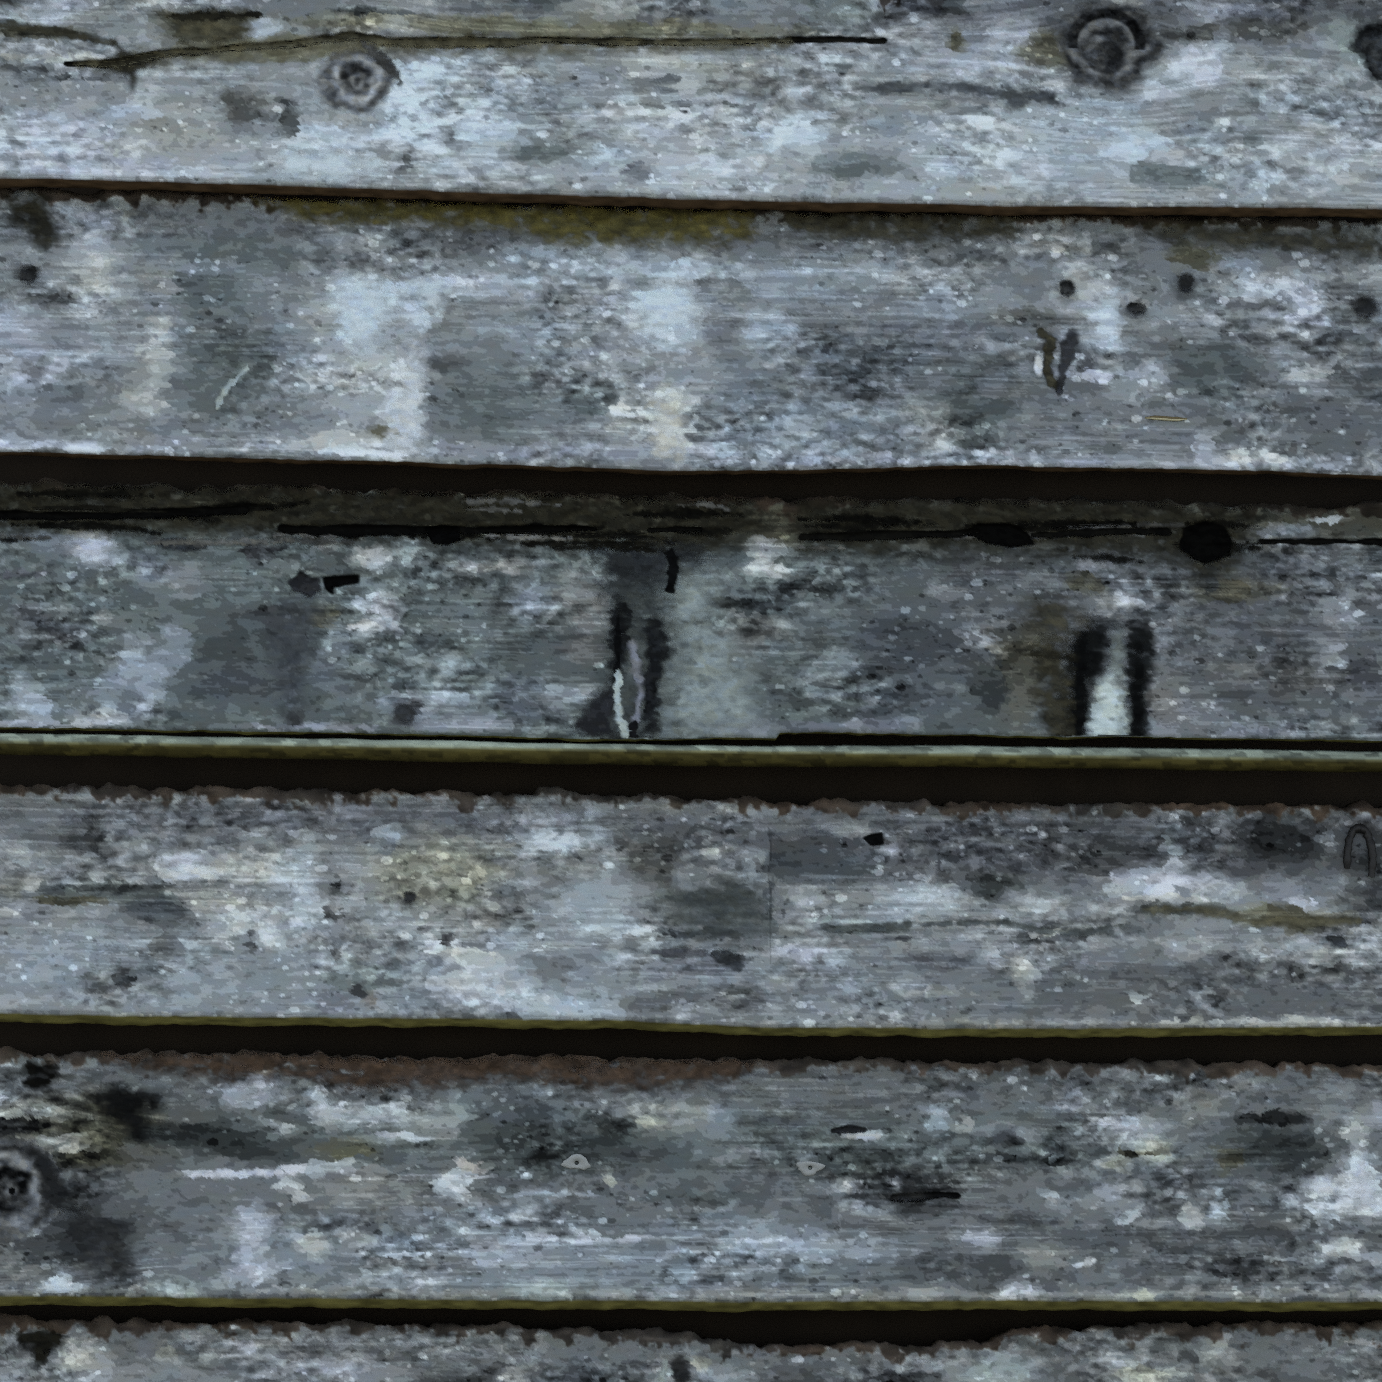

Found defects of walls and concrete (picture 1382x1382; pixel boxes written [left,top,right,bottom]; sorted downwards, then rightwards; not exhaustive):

crack [0,19,887,88]
crack [0,505,249,521]
crack [278,522,703,547]
crack [799,528,981,541]
crack [1031,528,1172,538]
crack [1259,538,1382,547]
water stain [459,508,743,738]
water stain [1024,603,1155,736]